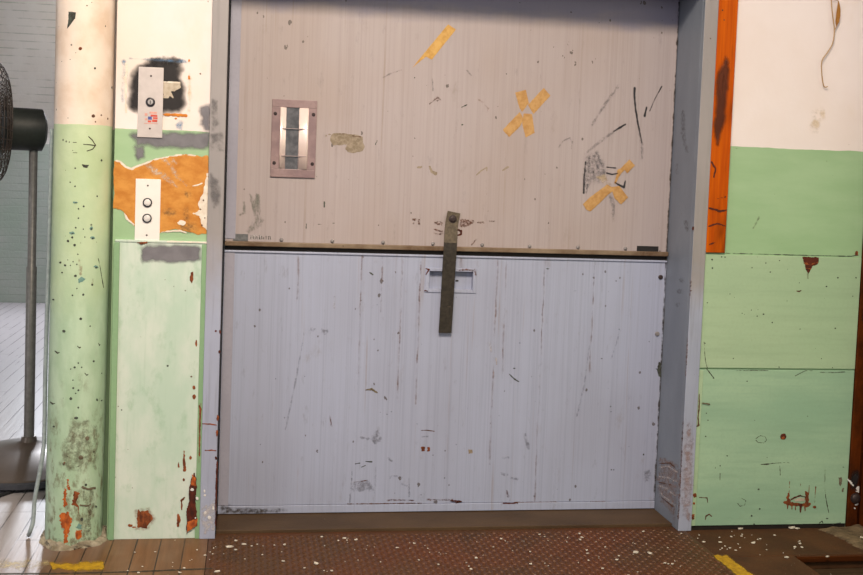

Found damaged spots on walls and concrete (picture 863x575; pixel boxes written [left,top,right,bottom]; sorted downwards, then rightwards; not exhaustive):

peeling [113,154,209,244]
rust [59,479,82,543]
rust [128,509,153,529]
rust [177,405,216,533]
rust [783,481,816,513]